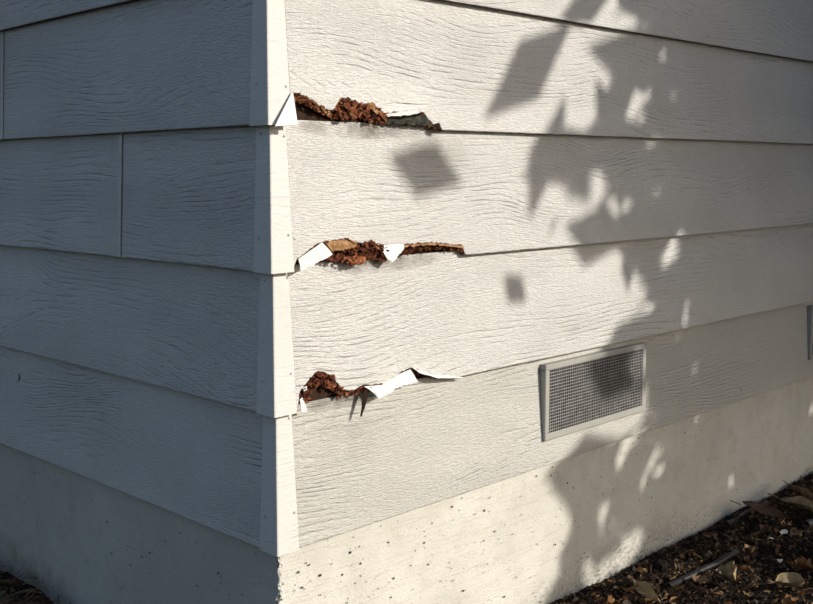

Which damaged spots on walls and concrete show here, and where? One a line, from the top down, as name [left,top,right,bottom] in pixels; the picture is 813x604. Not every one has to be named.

peeling [386,107,432,117]
peeling [298,243,333,271]
peeling [379,244,405,262]
peeling [364,367,463,399]